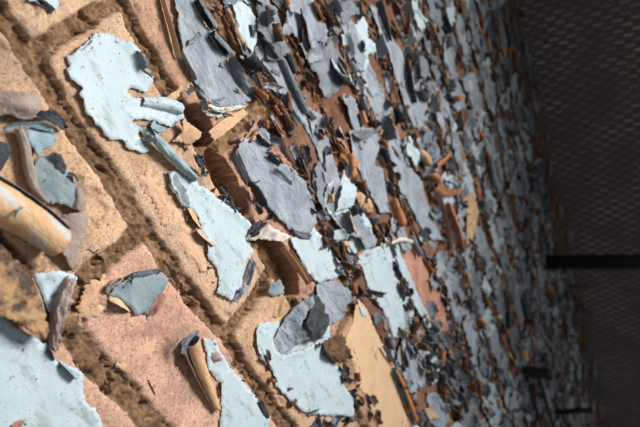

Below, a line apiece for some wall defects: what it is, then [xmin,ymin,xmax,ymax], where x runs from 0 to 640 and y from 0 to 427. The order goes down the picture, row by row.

peeling [0,91,169,427]
peeling [66,0,540,427]
peeling [422,0,590,427]